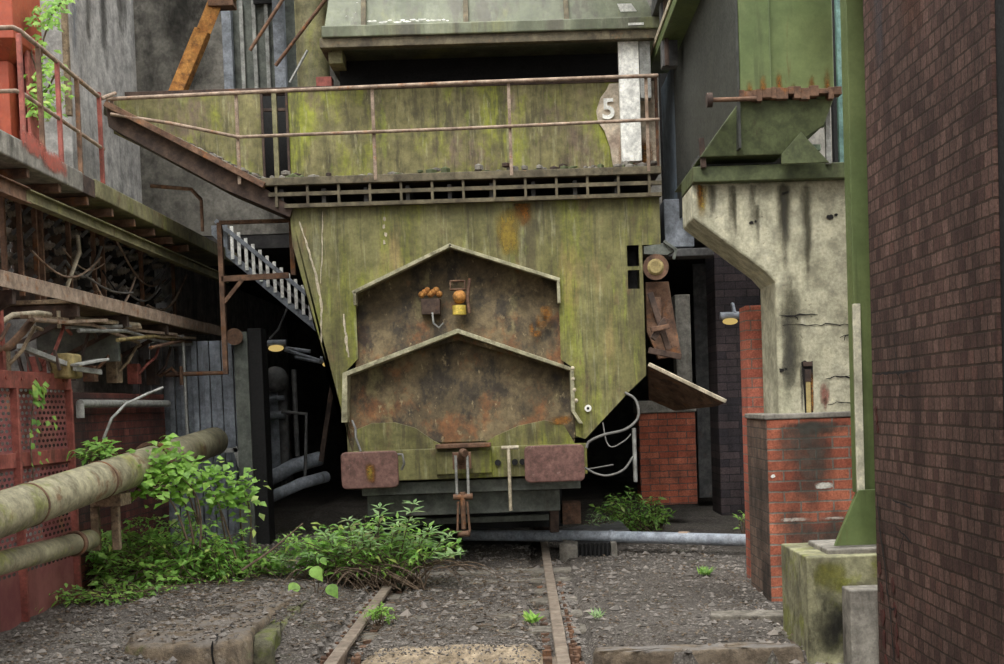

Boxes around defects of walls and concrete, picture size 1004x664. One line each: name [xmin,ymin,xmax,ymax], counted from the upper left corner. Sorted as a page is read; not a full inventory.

leakage [778,185,789,230]
leakage [783,286,797,376]
crack [780,313,849,340]
crack [826,375,850,405]